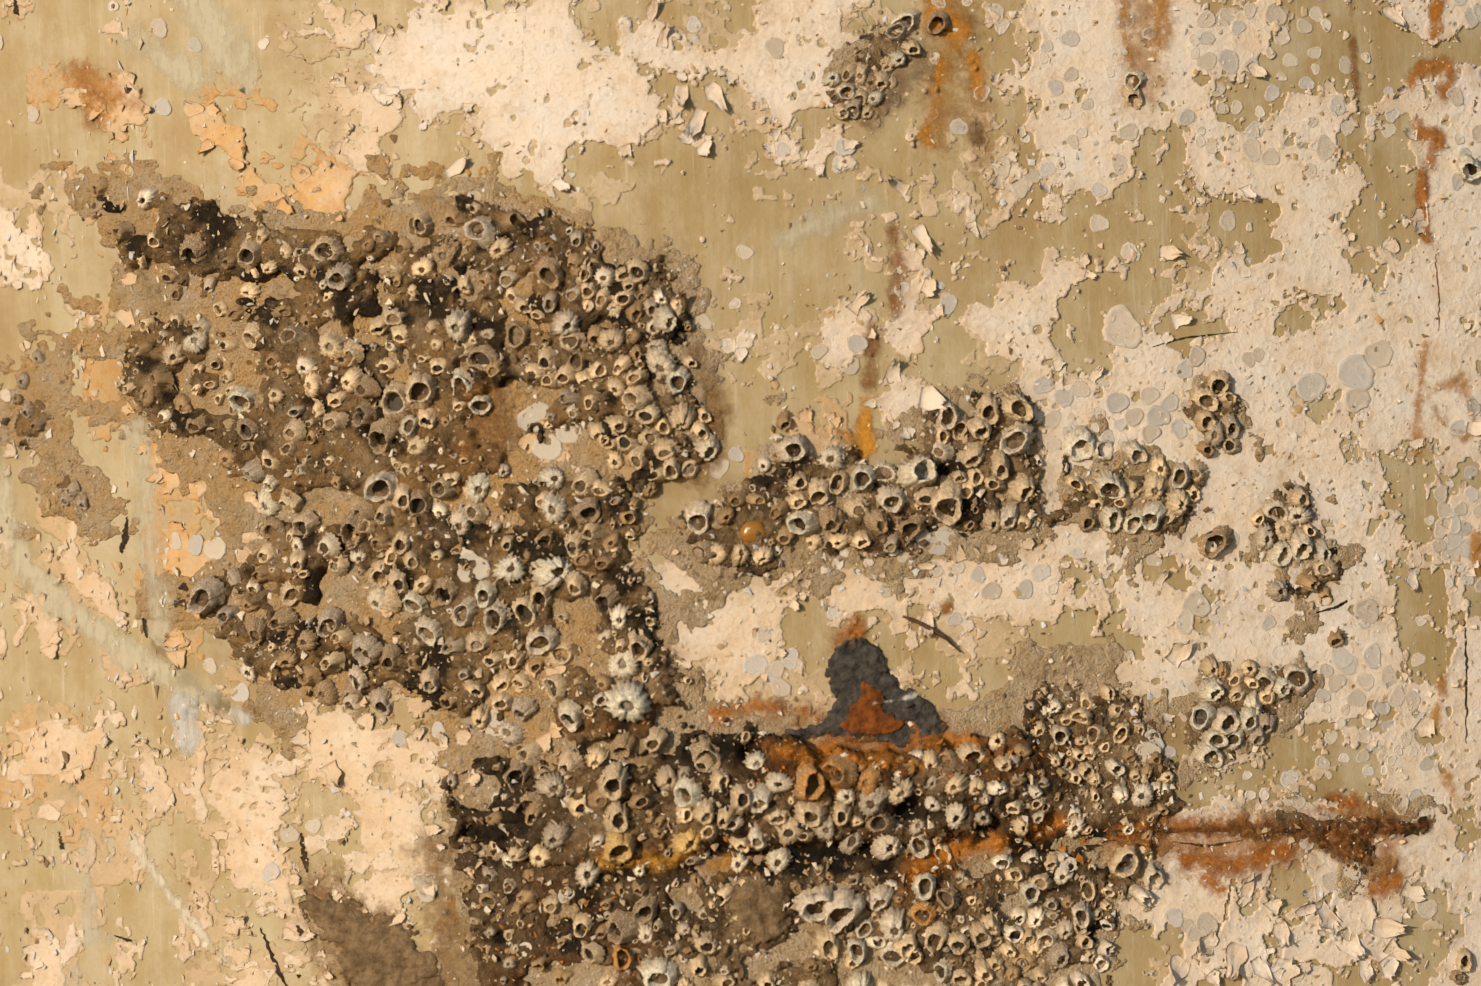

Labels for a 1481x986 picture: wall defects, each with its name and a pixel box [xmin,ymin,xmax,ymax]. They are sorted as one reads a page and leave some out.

peeling [0,164,96,292]
peeling [183,0,1027,240]
corrosion [919,0,985,148]
corrosion [1415,119,1446,243]
corrosion [1407,0,1456,100]
peeling [669,0,1481,986]
peeling [0,435,220,705]
peeling [627,540,708,609]
corrosion [709,614,990,770]
peeling [0,648,486,986]
corrosion [908,833,1006,880]
corrosion [1110,795,1432,896]